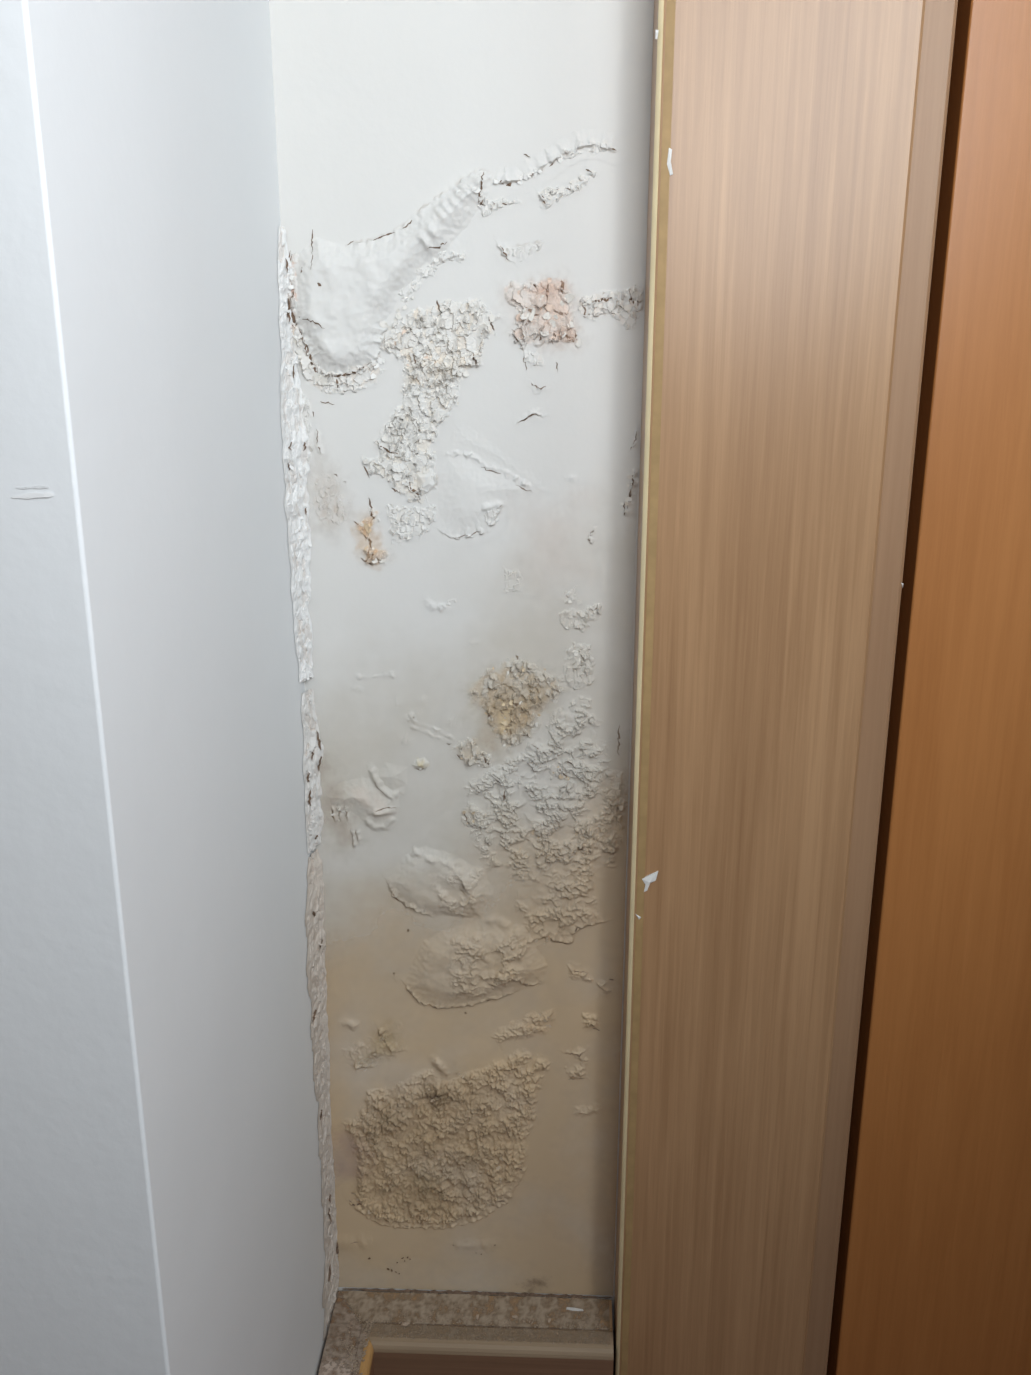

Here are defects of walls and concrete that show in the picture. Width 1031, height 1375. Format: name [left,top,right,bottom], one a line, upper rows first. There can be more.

peeling [284,128,644,569]
spalling [350,584,607,770]
damp [325,817,628,1295]